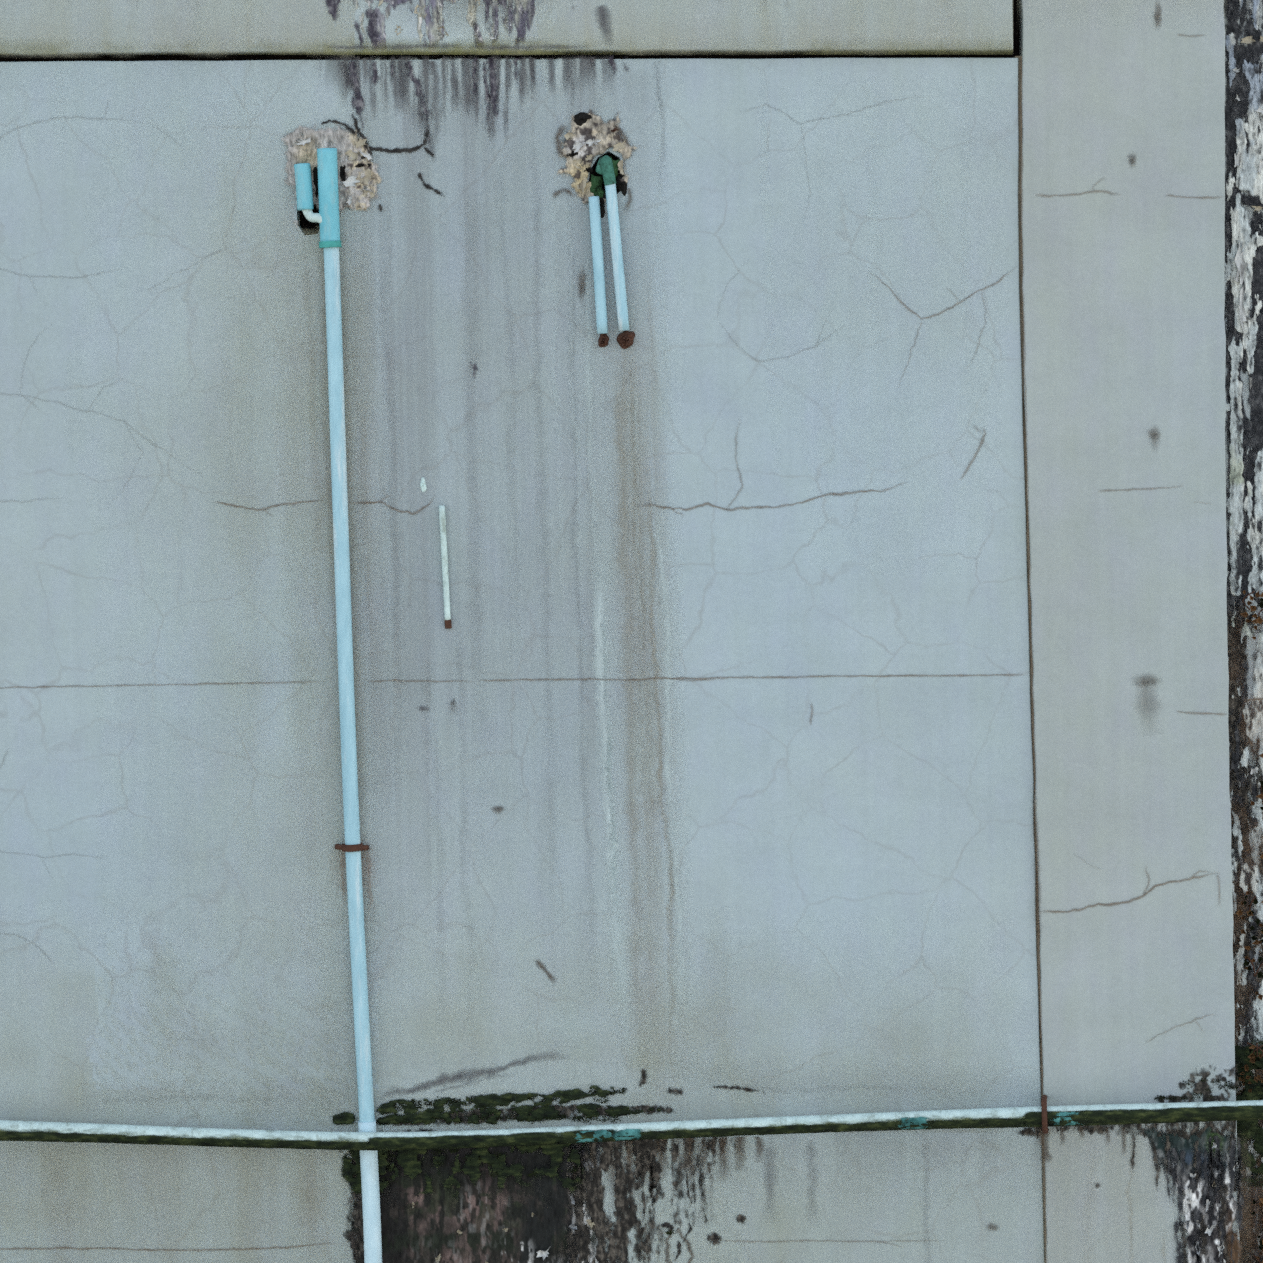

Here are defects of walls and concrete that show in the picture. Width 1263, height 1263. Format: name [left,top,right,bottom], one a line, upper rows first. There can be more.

water stain [341,58,594,146]
spalling [282,119,383,211]
spalling [554,109,636,218]
crack [655,490,875,510]
water stain [1224,0,1263,1047]
peeling [1225,0,1263,1046]
crack [861,672,971,680]
crack [1051,877,1200,912]
spalling [379,1142,612,1263]
water stain [566,1137,762,1263]
crack [1040,1132,1049,1180]
water stain [1019,1120,1263,1263]